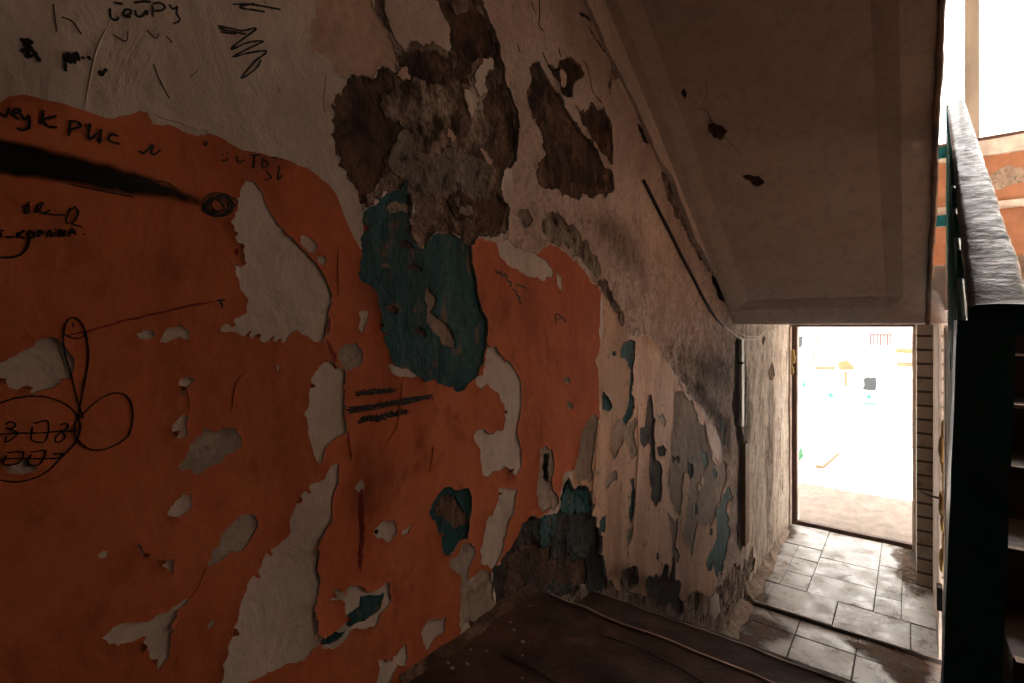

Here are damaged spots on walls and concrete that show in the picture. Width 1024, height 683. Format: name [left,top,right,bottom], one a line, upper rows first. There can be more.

spalling [743,174,764,186]
peeling [0,337,74,394]
spalling [221,0,624,683]
spalling [170,414,241,474]
spalling [429,340,754,626]
spalling [208,514,258,566]